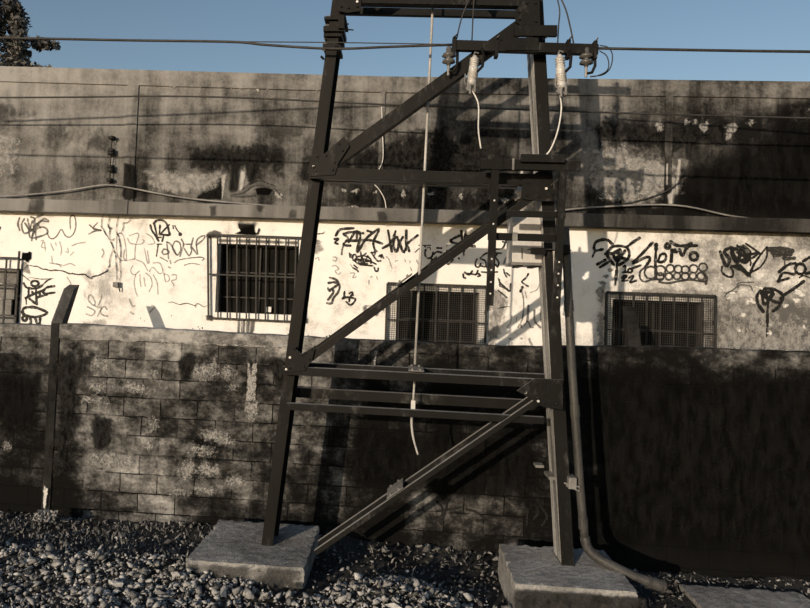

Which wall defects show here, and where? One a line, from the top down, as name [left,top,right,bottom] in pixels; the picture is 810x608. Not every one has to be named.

water stain [28,181,45,212]
water stain [122,163,135,200]
water stain [347,185,515,221]
water stain [354,128,509,173]
water stain [586,100,810,218]
crack [20,215,131,282]
water stain [0,351,94,475]
water stain [91,417,112,450]
water stain [590,370,810,556]